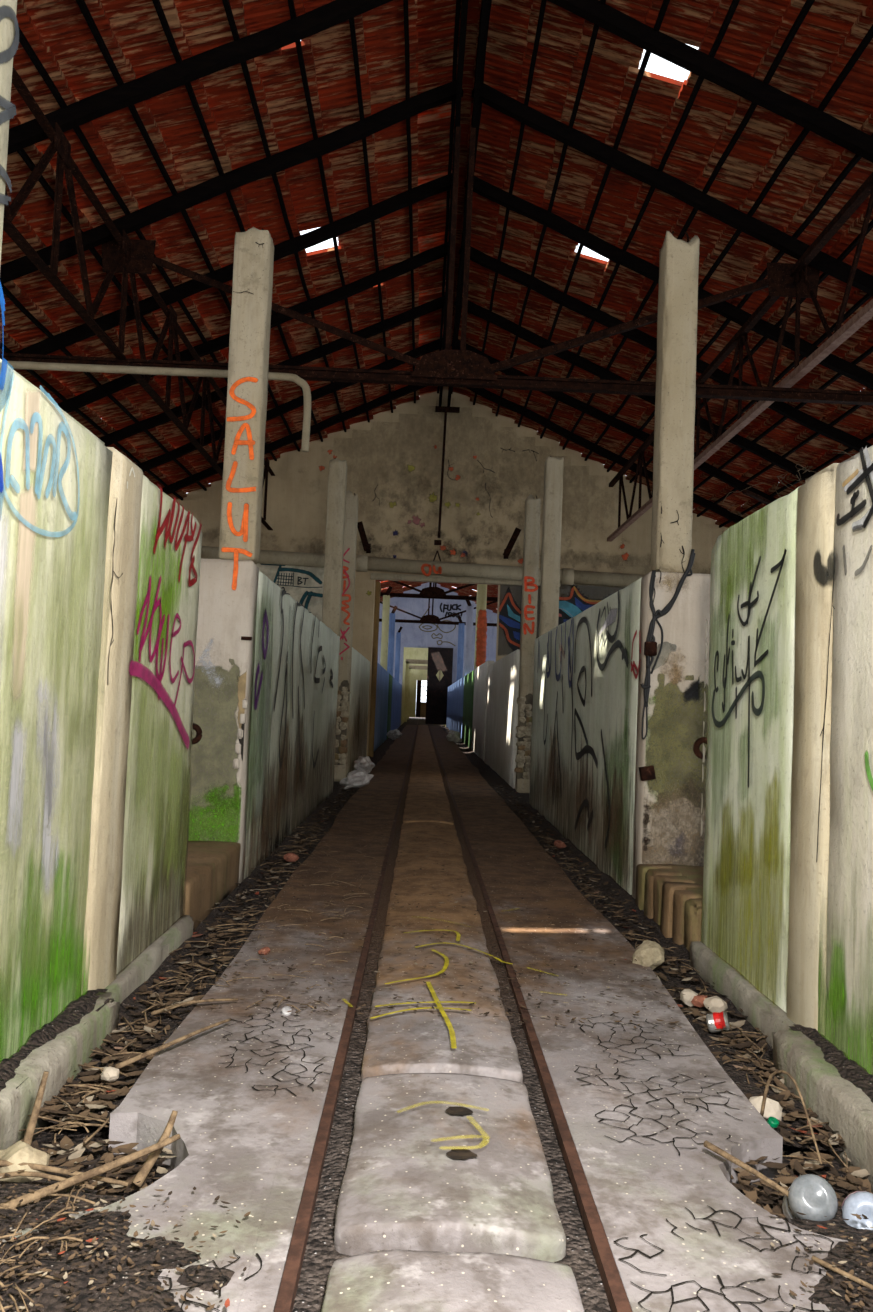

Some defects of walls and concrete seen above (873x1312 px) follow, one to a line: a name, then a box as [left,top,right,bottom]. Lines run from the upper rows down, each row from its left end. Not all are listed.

peeling [187,659,248,842]
peeling [646,619,708,836]
crack [223,1001,334,1096]
crack [574,1012,743,1156]
crack [613,1205,859,1312]